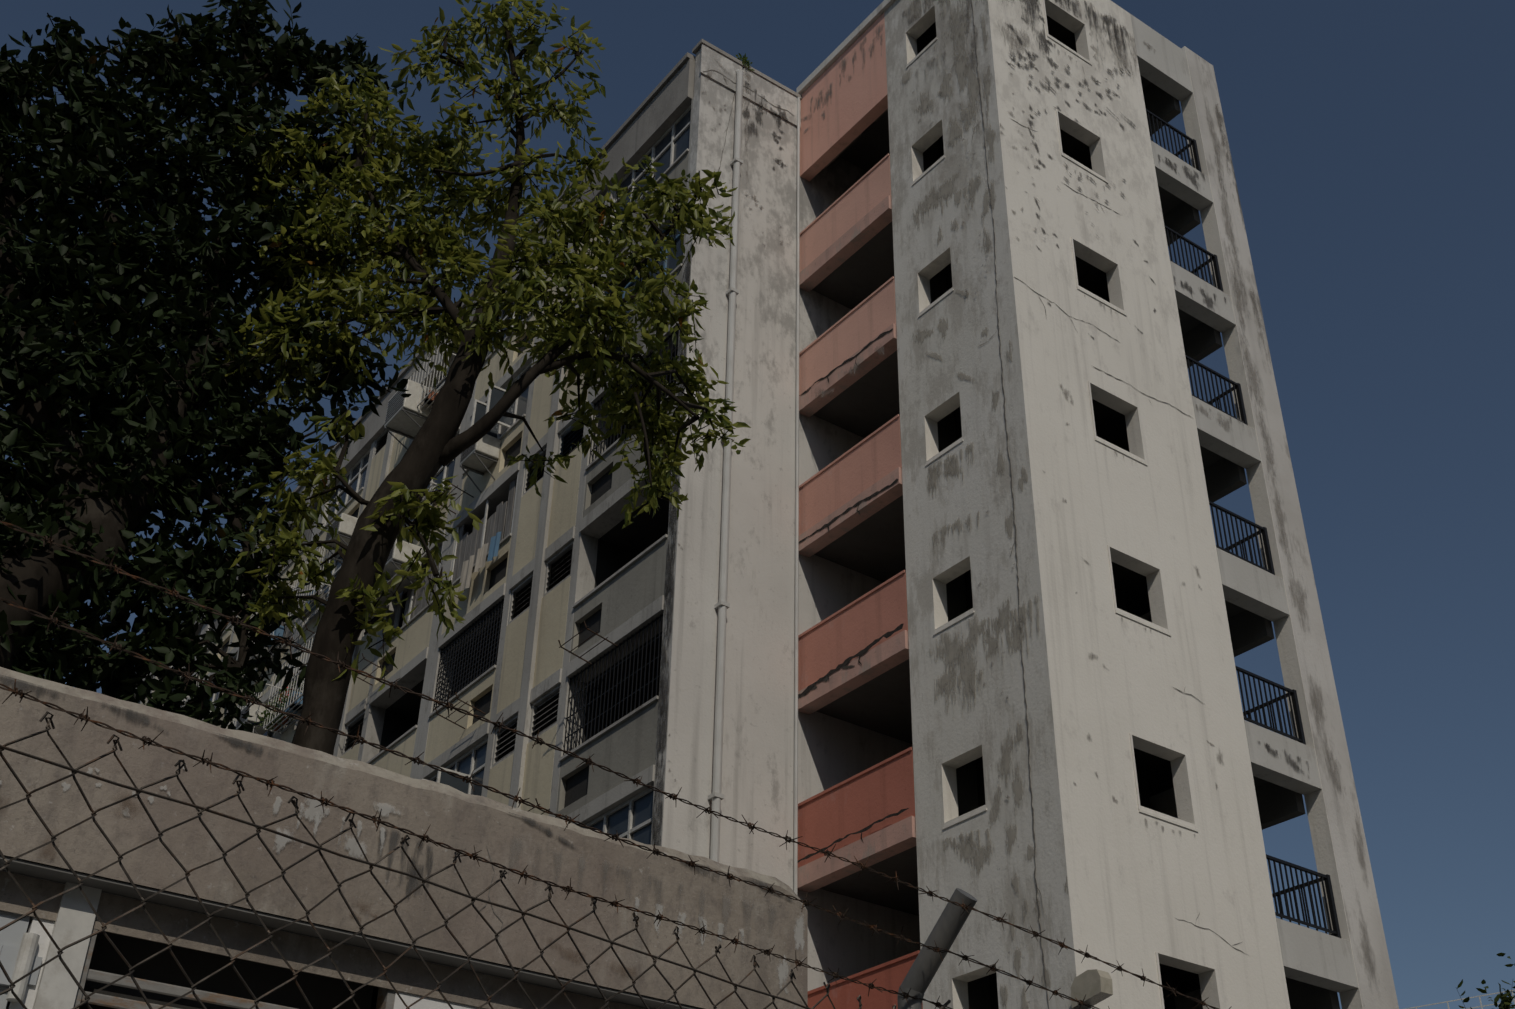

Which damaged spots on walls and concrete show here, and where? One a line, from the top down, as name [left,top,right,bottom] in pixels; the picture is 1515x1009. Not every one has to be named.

water stain [903,0,980,154]
water stain [1007,0,1151,67]
crack [971,0,1194,1009]
crack [1176,913,1244,953]